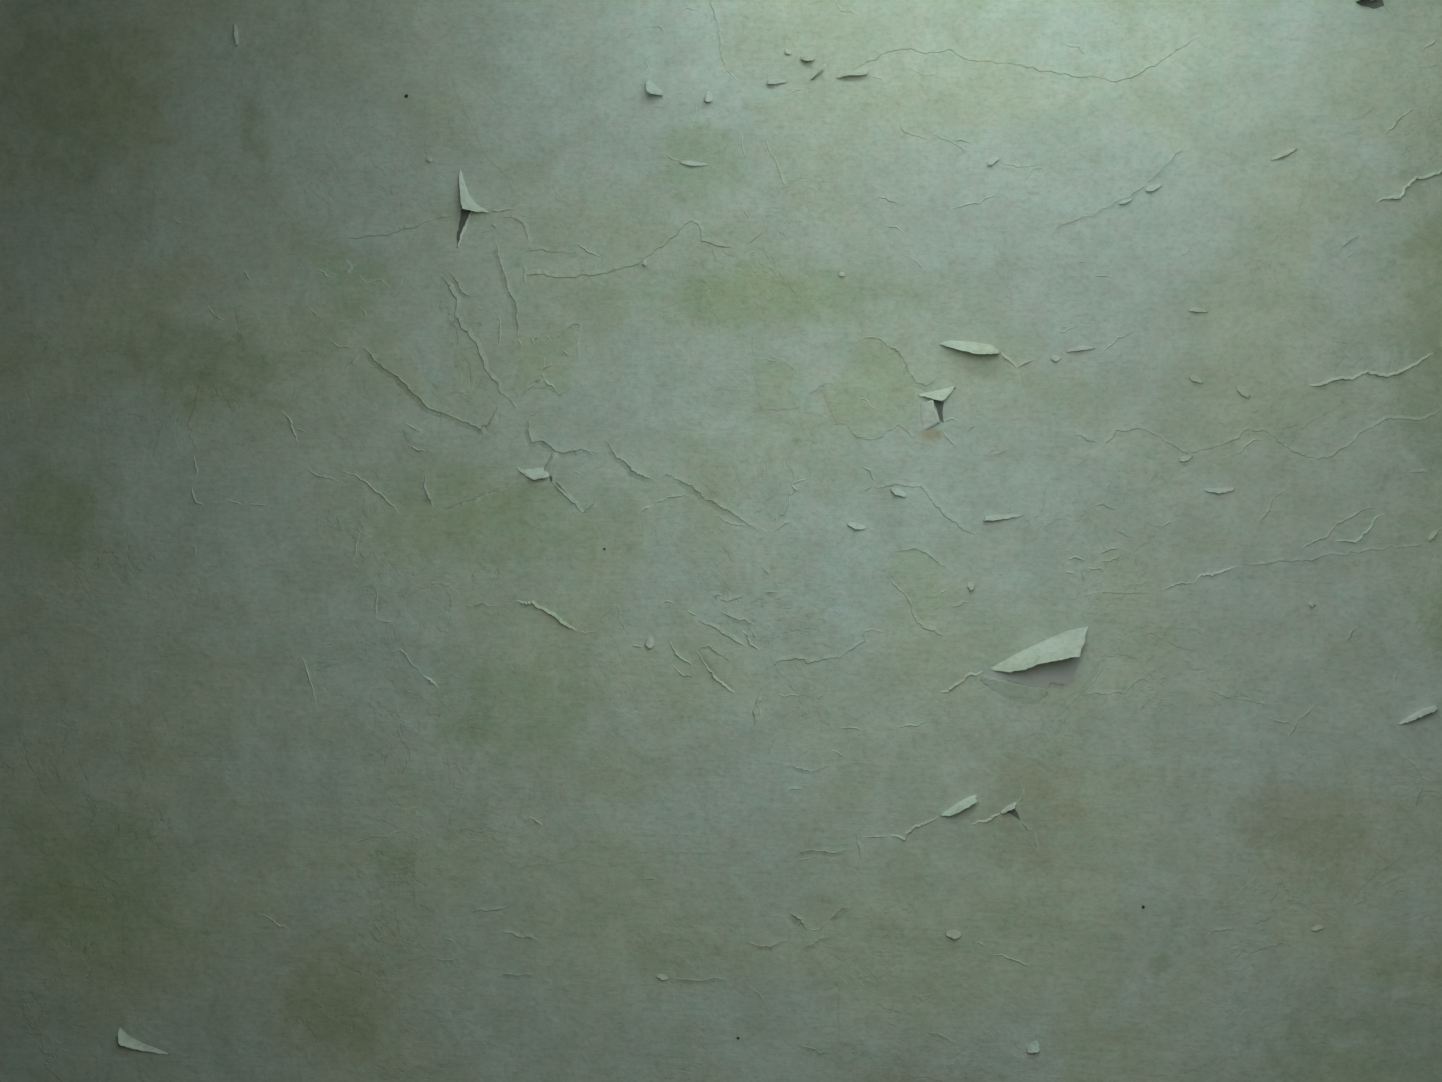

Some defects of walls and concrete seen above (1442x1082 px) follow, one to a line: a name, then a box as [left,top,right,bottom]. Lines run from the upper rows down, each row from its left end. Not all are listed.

peeling [1355,0,1391,16]
crack [846,35,1200,82]
peeling [342,169,527,248]
crack [1053,143,1187,232]
peeling [939,340,1034,390]
crack [1309,353,1434,386]
peeling [918,386,975,449]
crack [281,218,886,795]
crack [1066,409,1440,595]
peeling [940,626,1088,704]
peeling [891,789,1039,852]
crack [745,906,849,952]